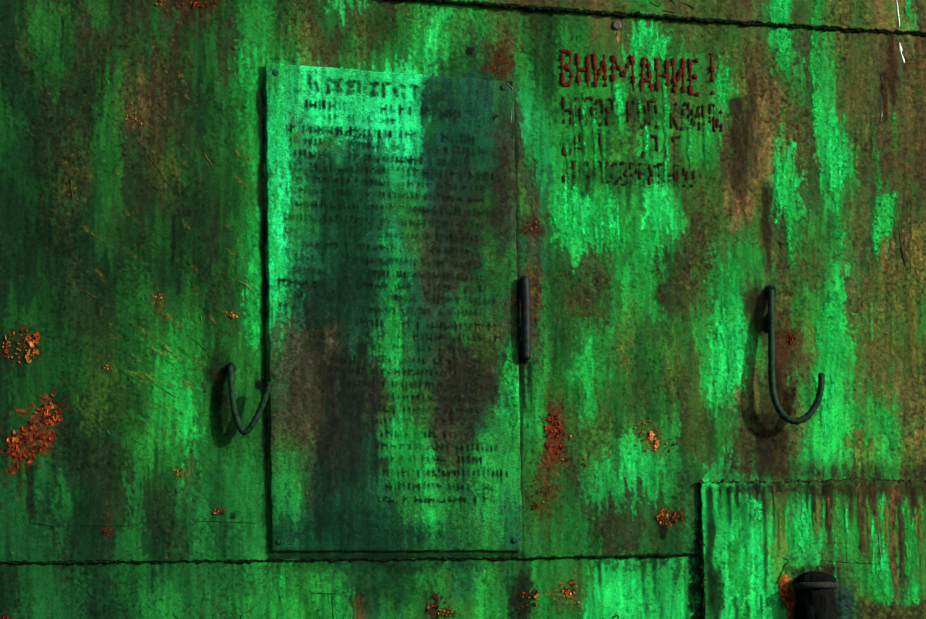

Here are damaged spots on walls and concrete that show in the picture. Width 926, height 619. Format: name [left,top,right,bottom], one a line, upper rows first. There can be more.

corrosion [0,325,42,363]
corrosion [0,393,63,475]
corrosion [545,413,590,466]
corrosion [634,417,679,452]
corrosion [656,509,684,527]
corrosion [426,591,455,619]
corrosion [510,589,540,617]
corrosion [554,580,580,609]